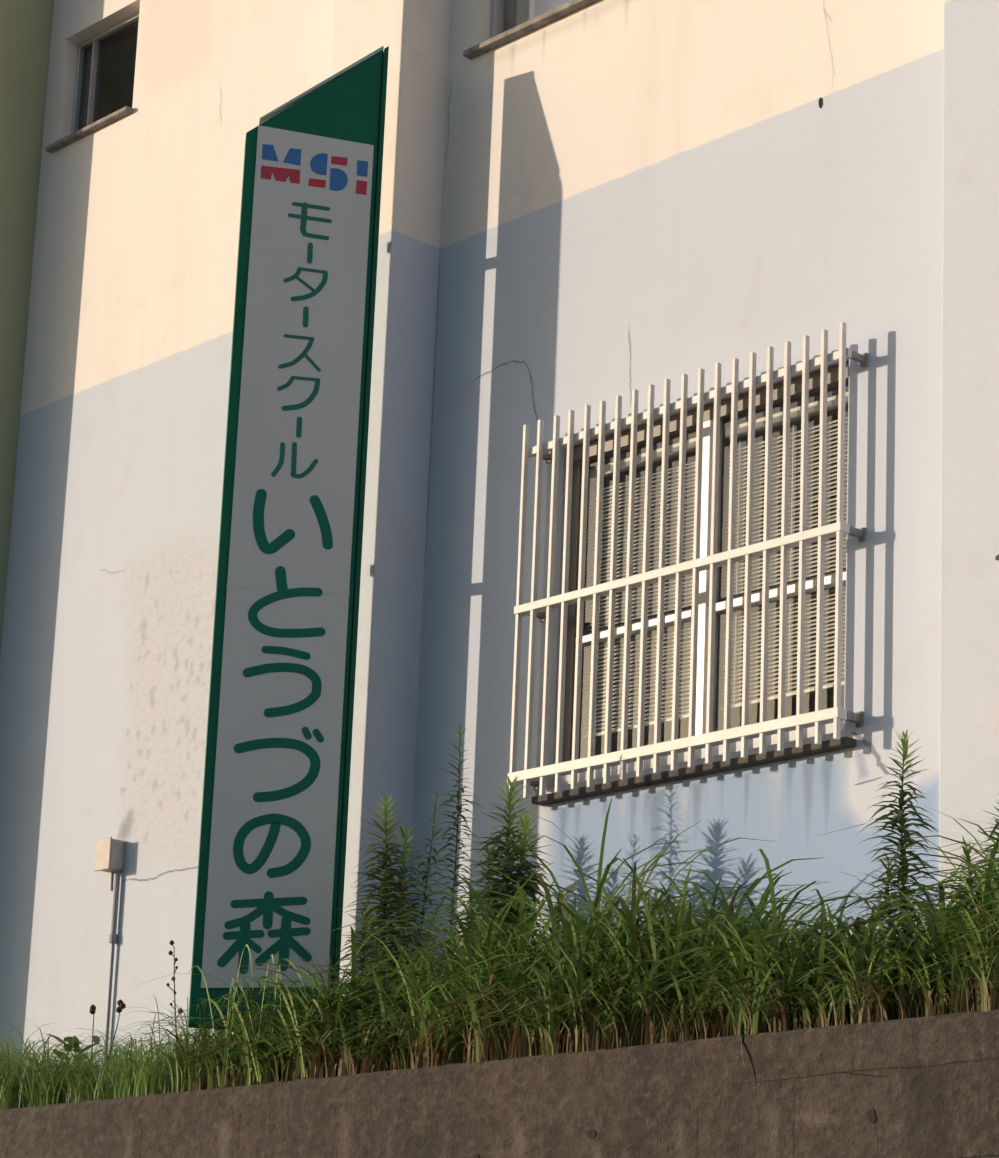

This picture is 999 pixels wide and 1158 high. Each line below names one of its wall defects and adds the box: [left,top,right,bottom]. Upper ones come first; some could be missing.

leakage [535,728,939,945]
crack [853,732,915,776]